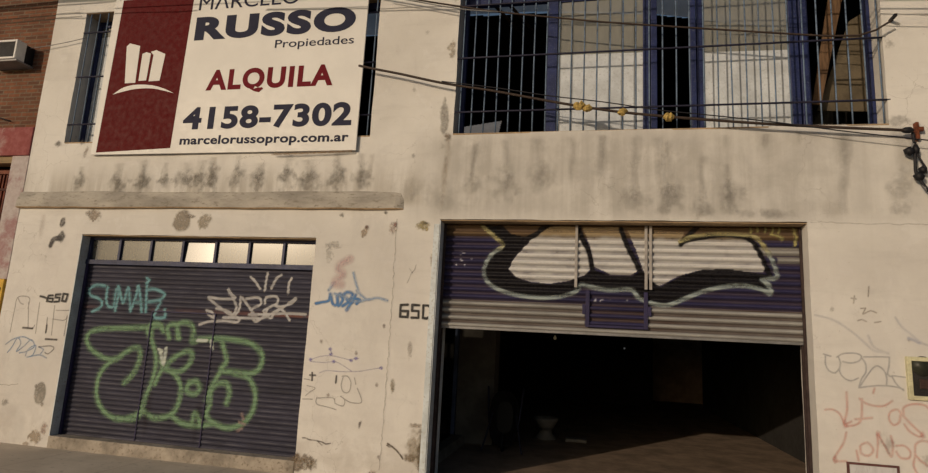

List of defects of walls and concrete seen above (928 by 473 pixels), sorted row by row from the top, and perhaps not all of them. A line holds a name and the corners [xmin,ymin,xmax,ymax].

flaking render [173,210,211,230]